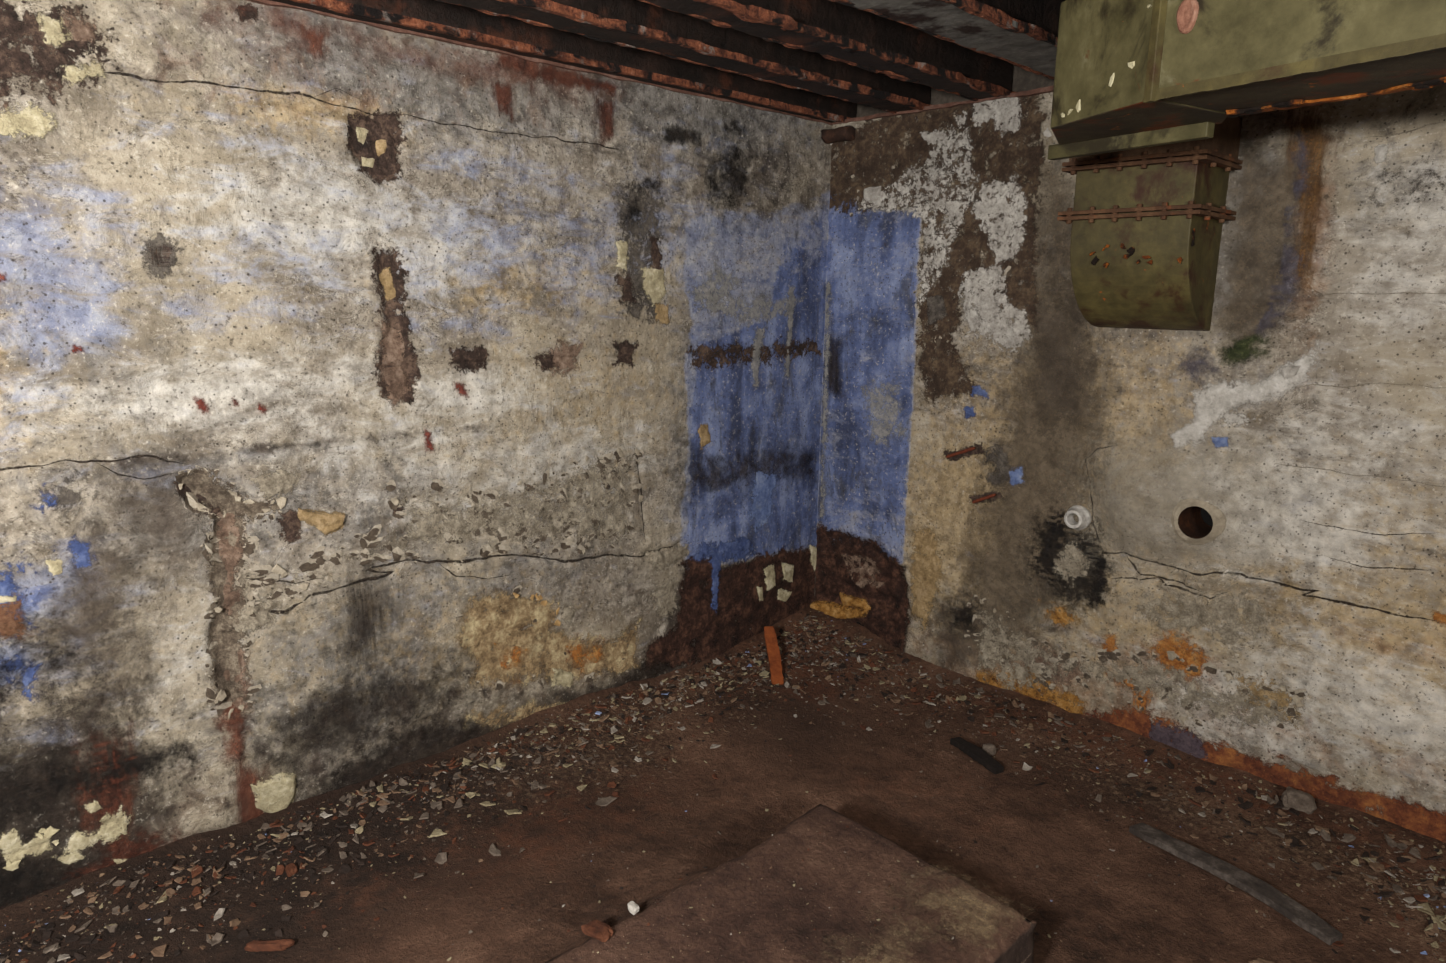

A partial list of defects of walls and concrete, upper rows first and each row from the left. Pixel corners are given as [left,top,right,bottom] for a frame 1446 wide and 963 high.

rust [290,0,1015,139]
rust [1155,33,1446,101]
spalling [369,243,426,410]
peeling [829,94,1052,419]
crack [0,455,188,480]
spalling [173,443,644,768]
crack [246,458,678,614]
leakage [906,166,1108,669]
leakage [268,663,494,794]
rust [976,666,1446,843]
leakage [0,846,106,910]
peeling [0,801,134,871]